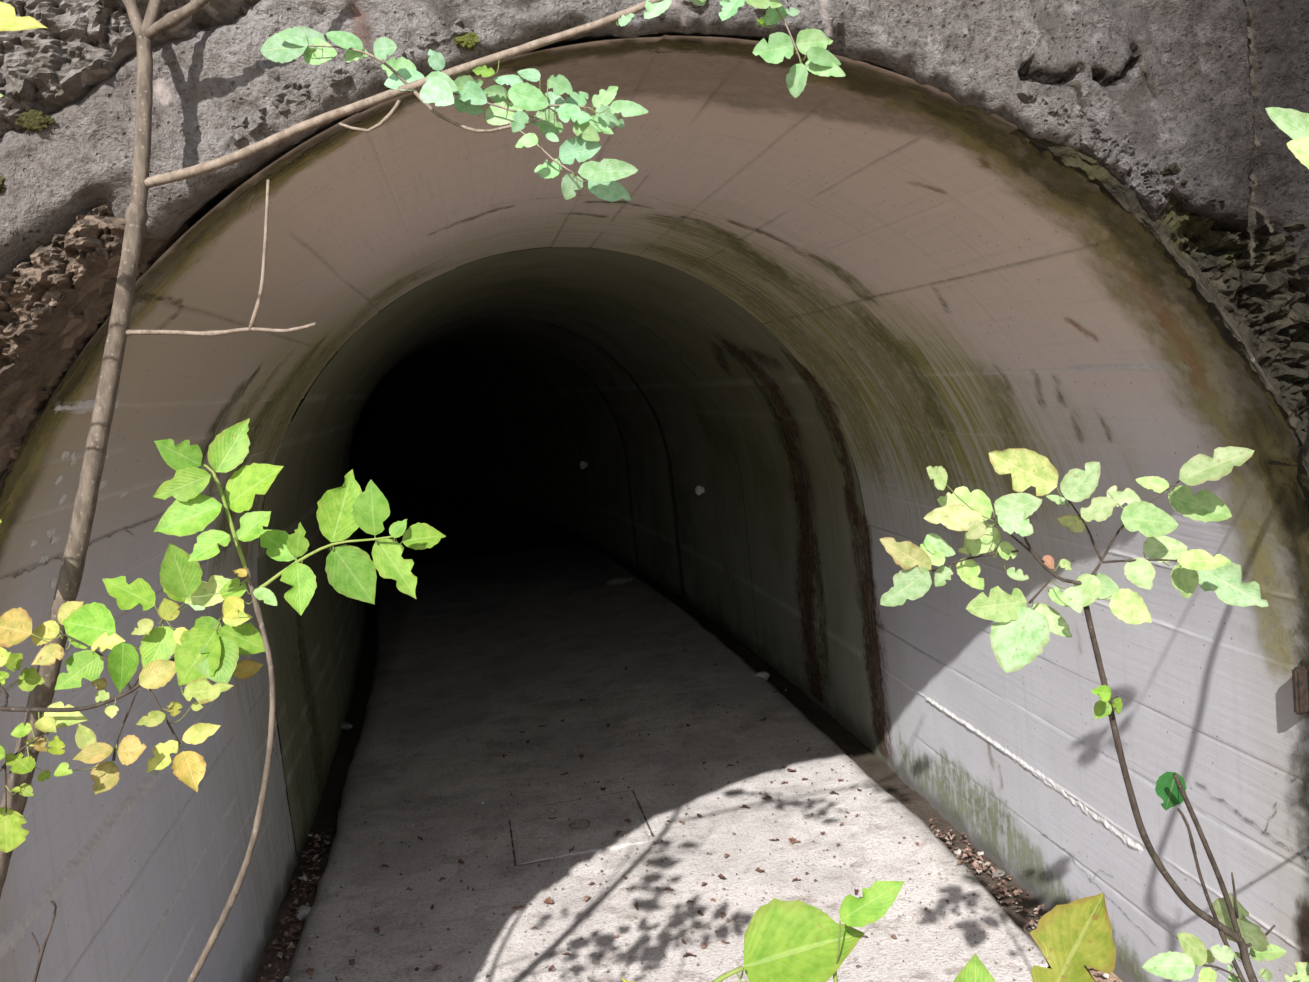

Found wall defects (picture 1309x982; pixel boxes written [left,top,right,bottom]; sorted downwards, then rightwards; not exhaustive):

damp [0,320,110,541]
spalling [0,202,125,482]
spalling [136,223,191,330]
damp [129,92,420,329]
damp [453,40,1309,671]
spalling [996,78,1309,511]
damp [900,742,1070,905]
crack [1197,749,1309,861]
damp [1292,713,1309,857]